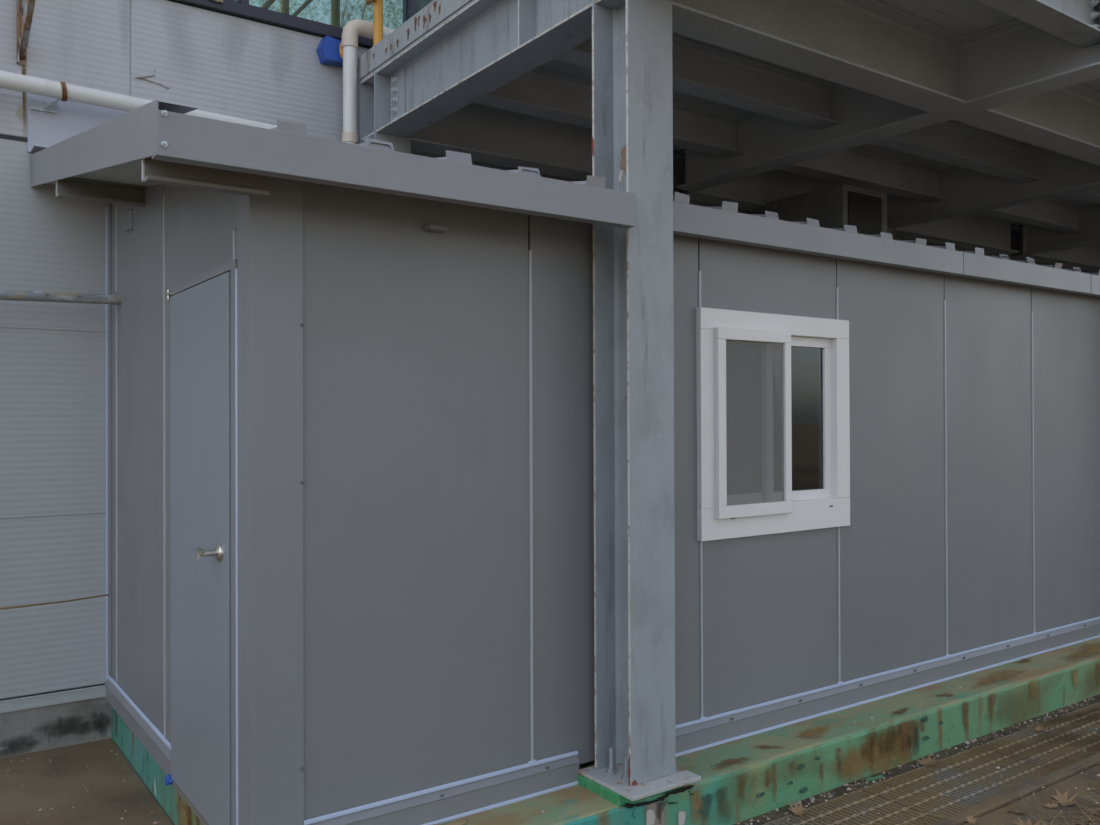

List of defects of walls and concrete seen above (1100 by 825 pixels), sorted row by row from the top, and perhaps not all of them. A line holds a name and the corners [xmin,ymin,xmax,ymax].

corrosion [373,1,440,59]
corrosion [980,659,1029,717]
corrosion [837,708,924,773]
corrosion [718,757,747,798]